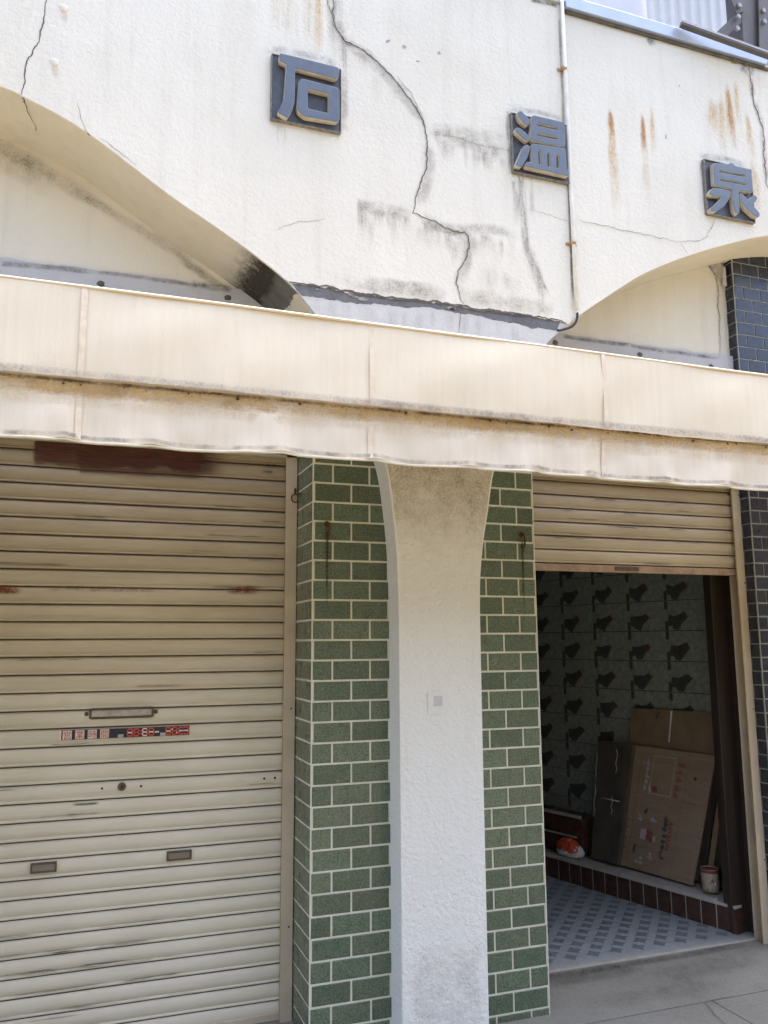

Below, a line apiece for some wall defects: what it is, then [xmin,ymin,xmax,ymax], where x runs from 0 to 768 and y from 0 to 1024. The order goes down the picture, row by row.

crack [21,0,47,131]
crack [290,0,566,334]
crack [748,68,768,187]
water stain [223,260,297,310]
crack [530,209,716,254]